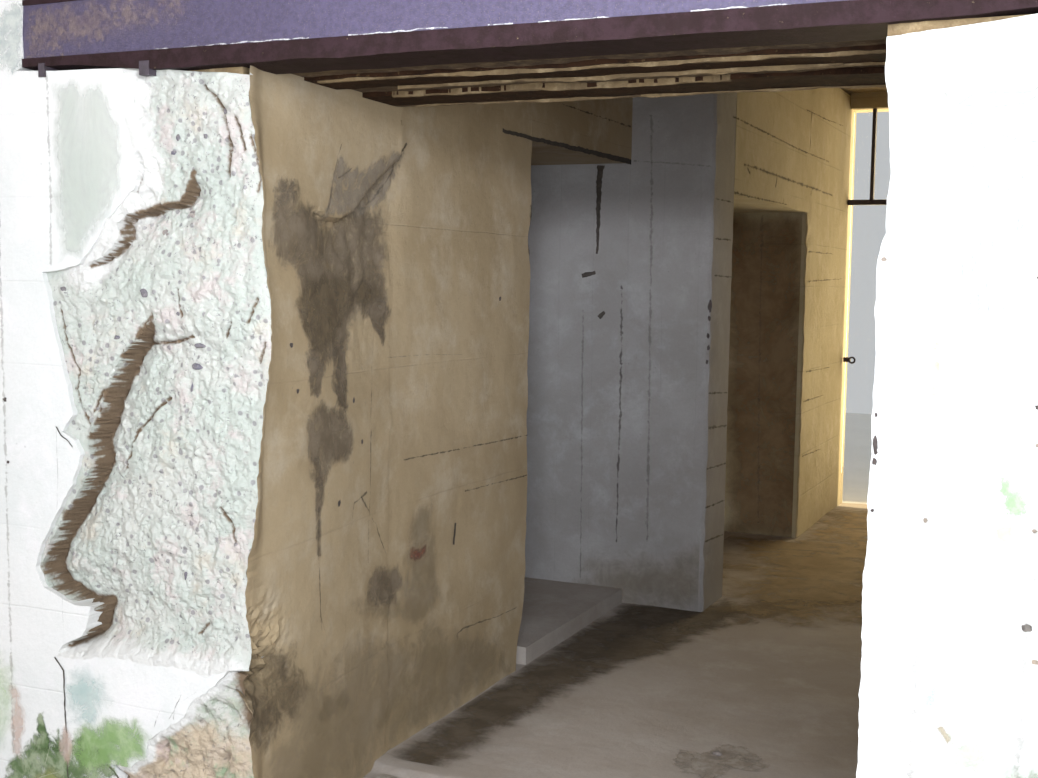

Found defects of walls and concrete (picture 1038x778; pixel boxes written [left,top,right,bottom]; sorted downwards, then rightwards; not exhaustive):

spalling [40,68,272,778]
leakage [274,182,390,556]
leakage [35,713,62,751]